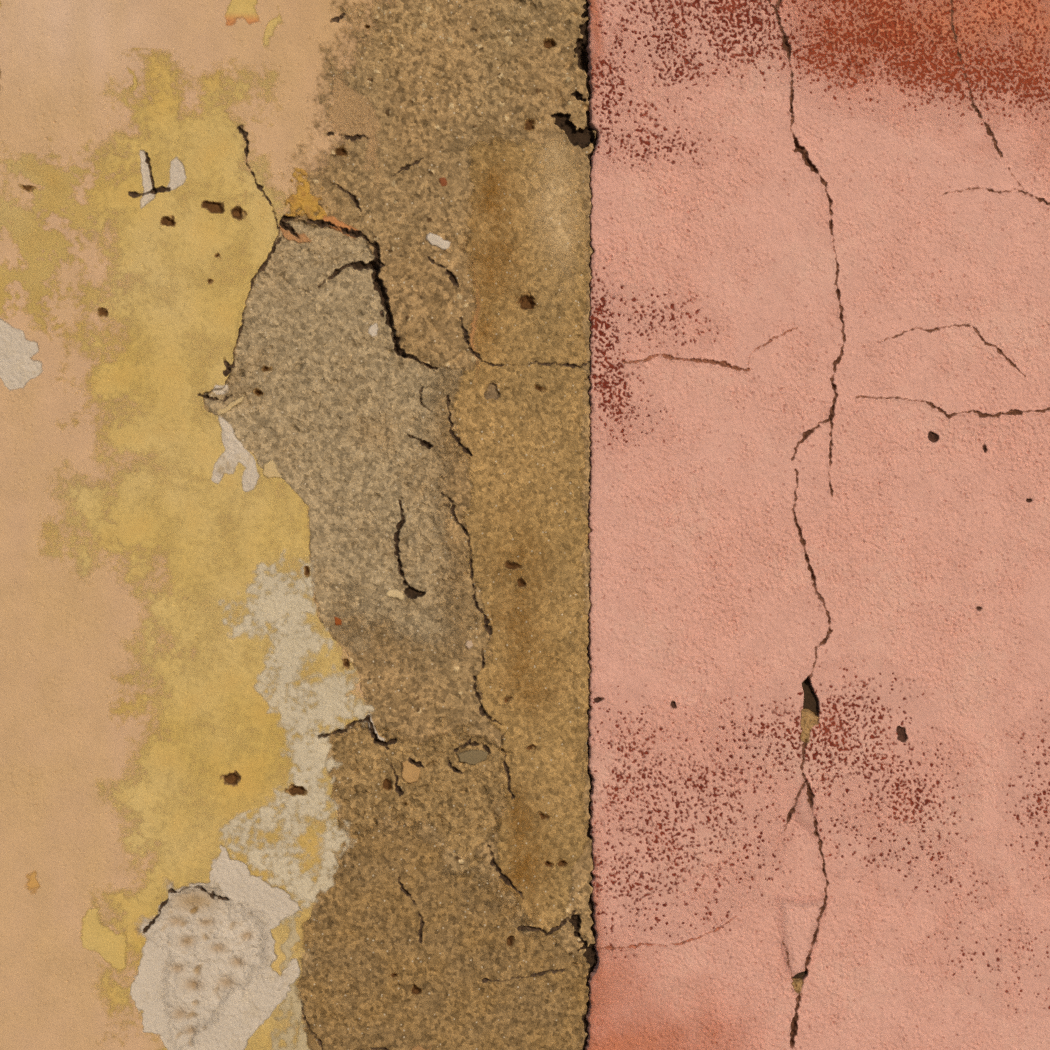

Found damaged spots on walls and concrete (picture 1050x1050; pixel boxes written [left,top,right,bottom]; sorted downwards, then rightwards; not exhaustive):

crack [551,0,597,190]
crack [198,314,244,401]
crack [238,125,473,456]
crack [460,317,504,367]
crack [529,314,591,405]
crack [623,328,795,371]
crack [767,0,1050,680]
peeling [0,0,604,1050]
crack [482,704,736,1050]
crack [782,742,829,1047]